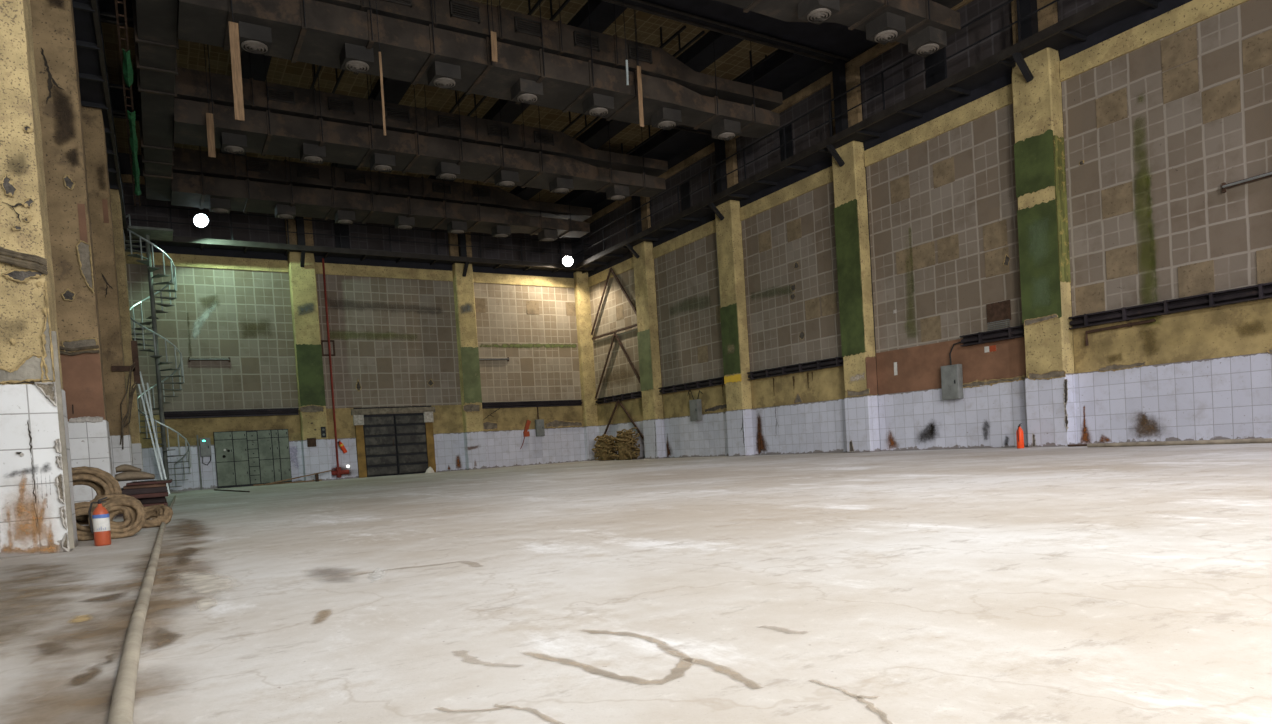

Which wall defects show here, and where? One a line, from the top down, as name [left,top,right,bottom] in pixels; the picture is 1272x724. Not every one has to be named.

rust [757,418,766,453]
rust [1081,406,1110,442]
rust [3,479,56,552]